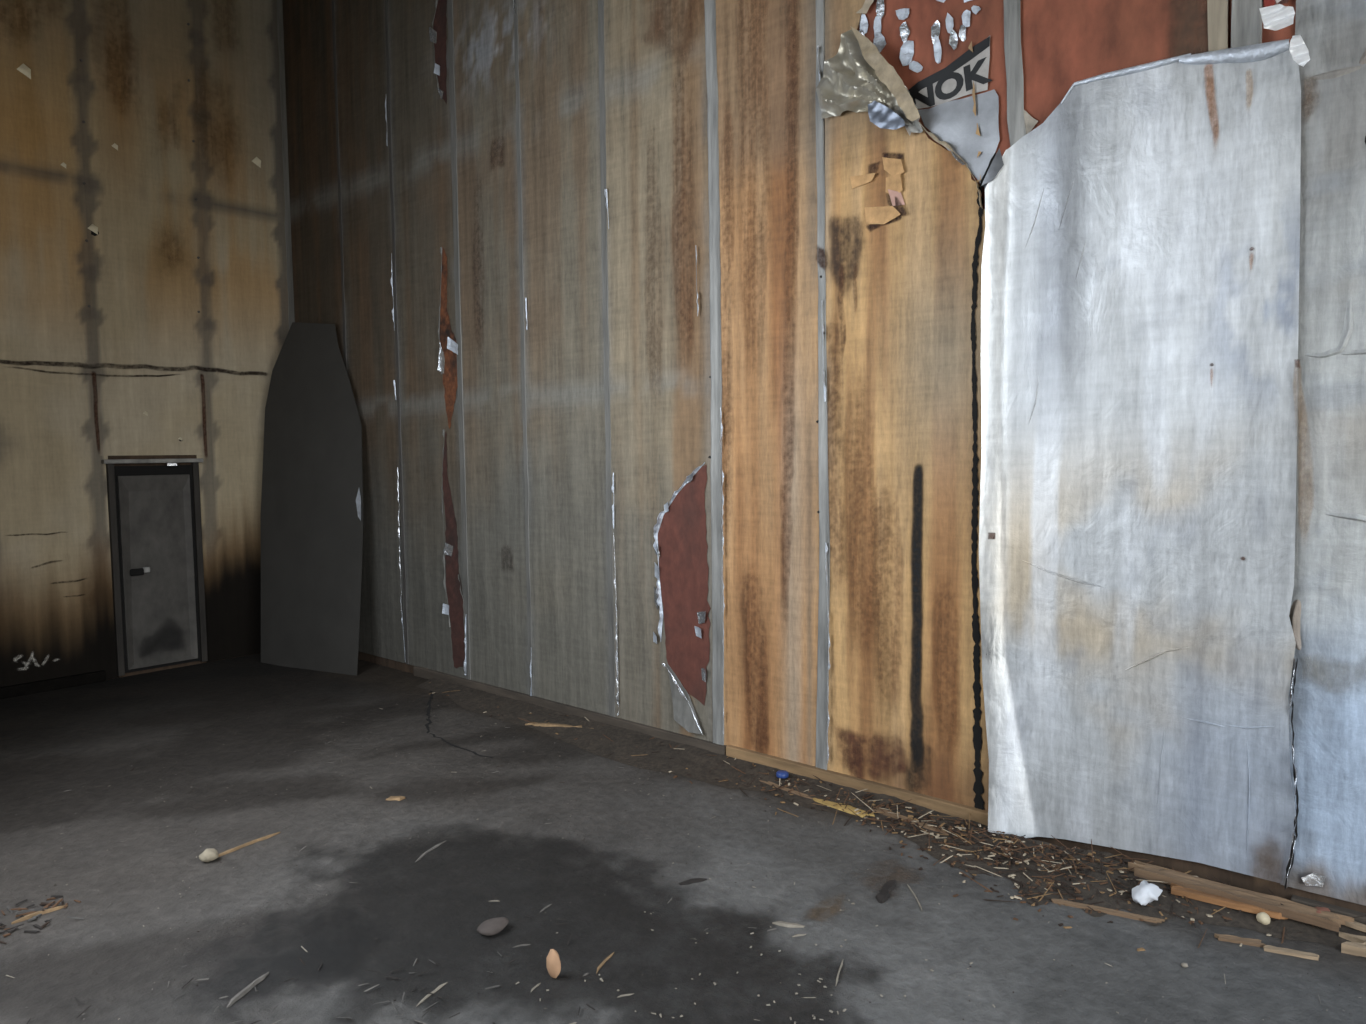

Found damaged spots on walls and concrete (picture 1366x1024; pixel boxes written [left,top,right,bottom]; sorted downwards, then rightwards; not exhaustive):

peeling [816,0,1000,209]
peeling [1170,0,1208,57]
corrosion [0,360,267,457]
peeling [438,337,458,374]
peeling [653,463,711,735]
damp [224,832,839,1024]